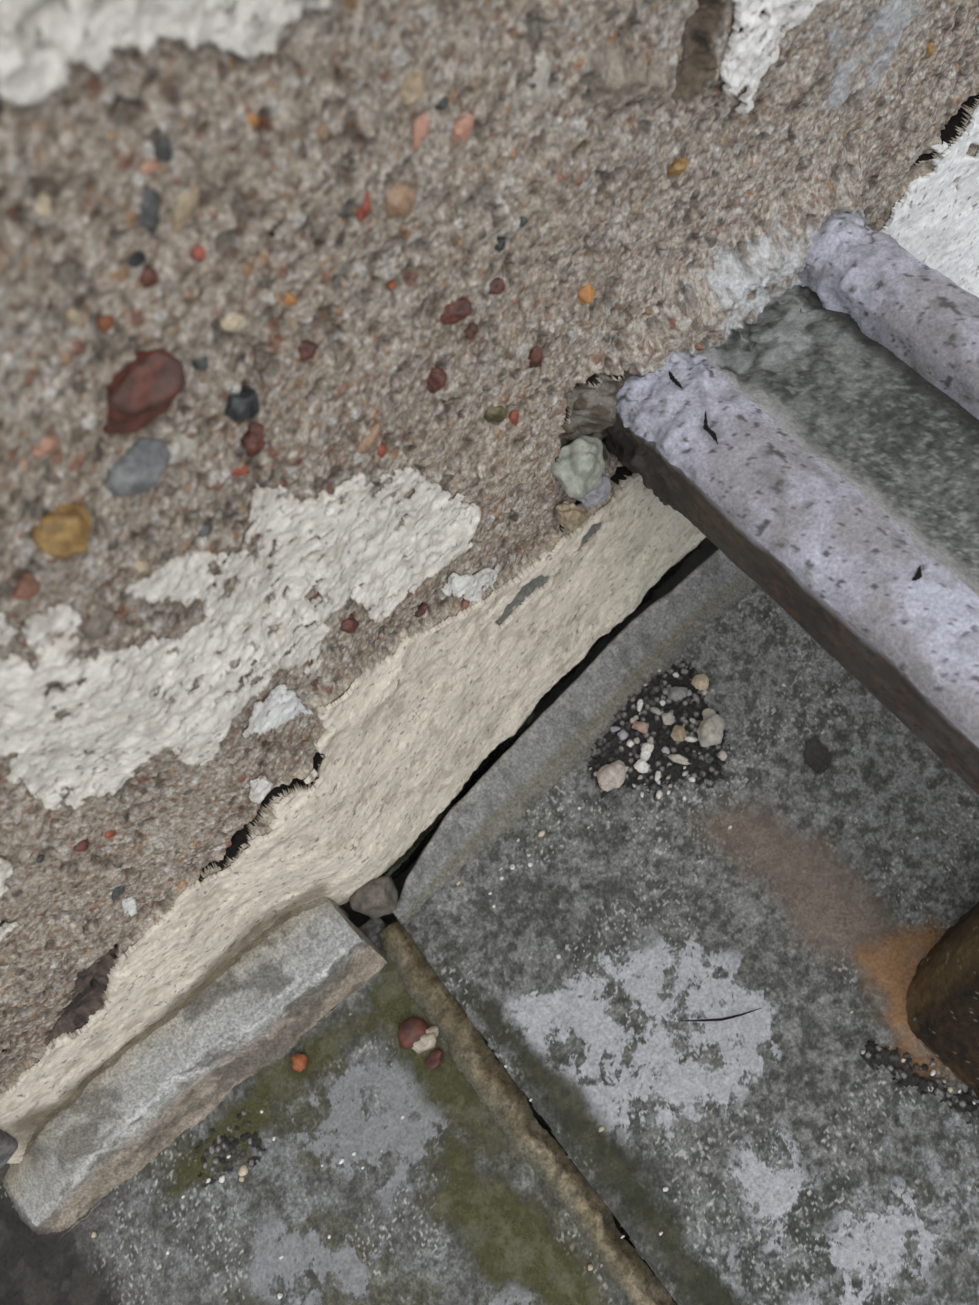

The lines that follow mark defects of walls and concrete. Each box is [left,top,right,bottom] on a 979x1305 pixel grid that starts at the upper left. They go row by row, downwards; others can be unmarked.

peeling [0,0,337,115]
peeling [671,0,826,114]
crack [910,93,979,167]
crack [198,752,324,882]
peeling [0,467,706,1164]